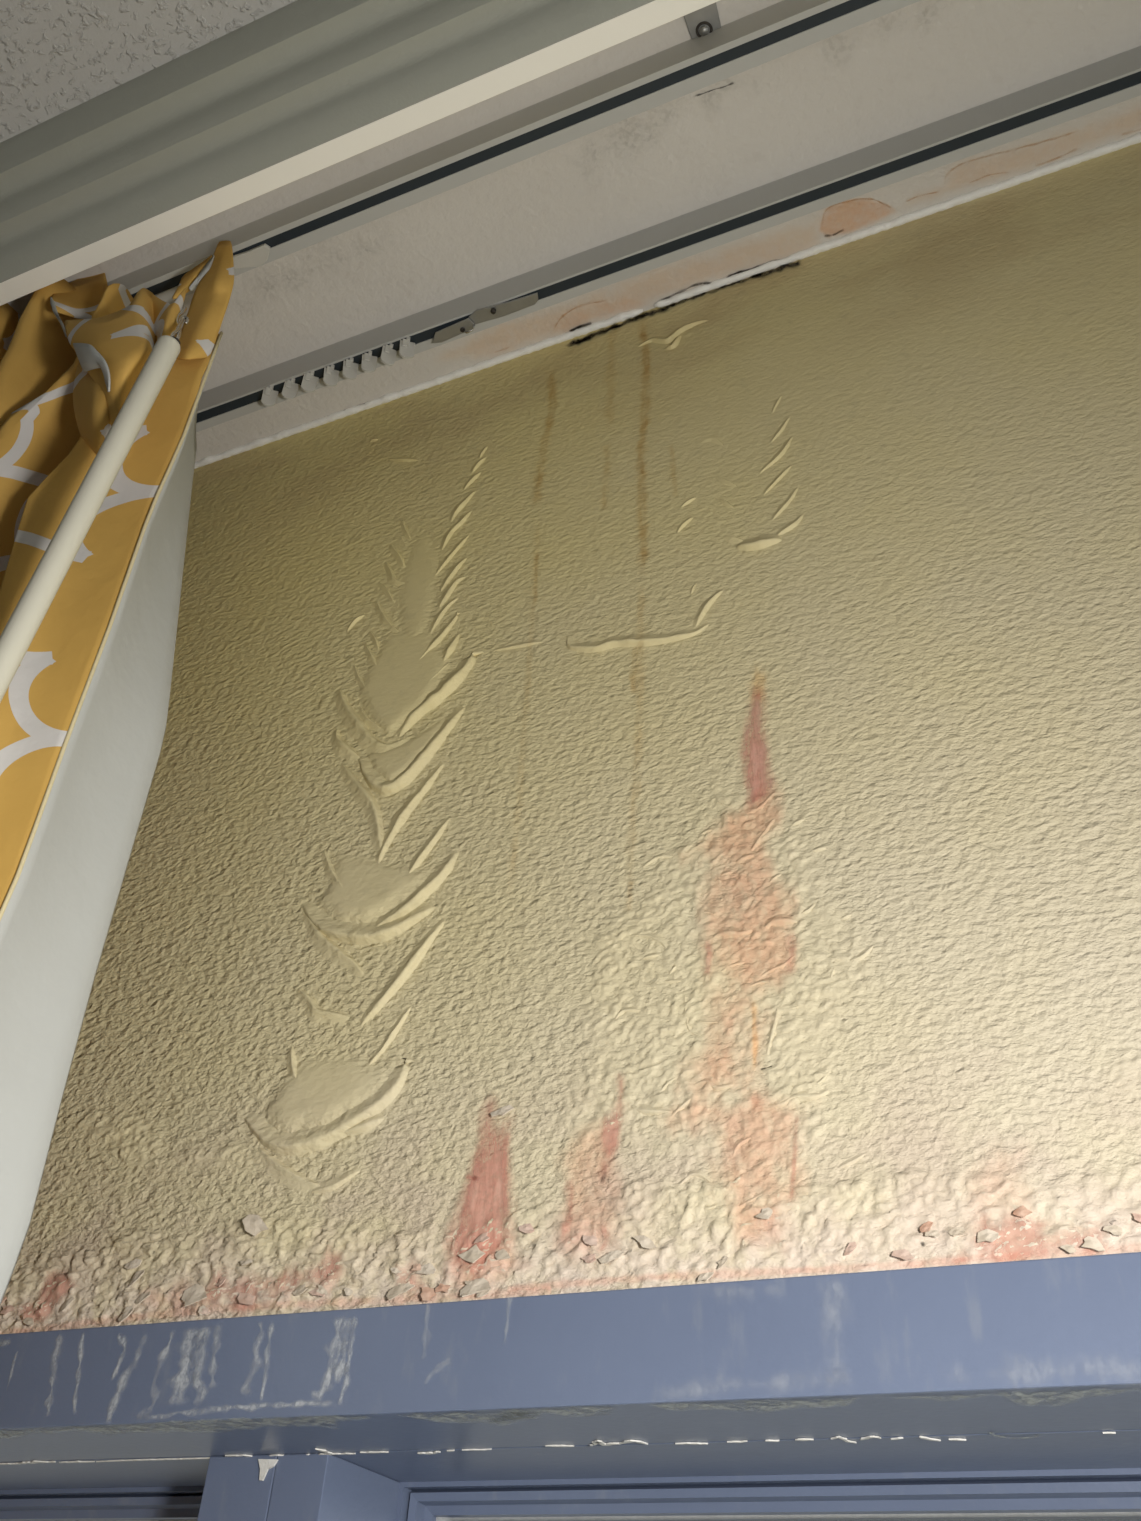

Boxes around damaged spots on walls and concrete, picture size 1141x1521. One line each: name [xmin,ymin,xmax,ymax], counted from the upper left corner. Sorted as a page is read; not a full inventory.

corrosion [456,1130,507,1264]
crack [545,1436,966,1447]
crack [0,1448,492,1481]